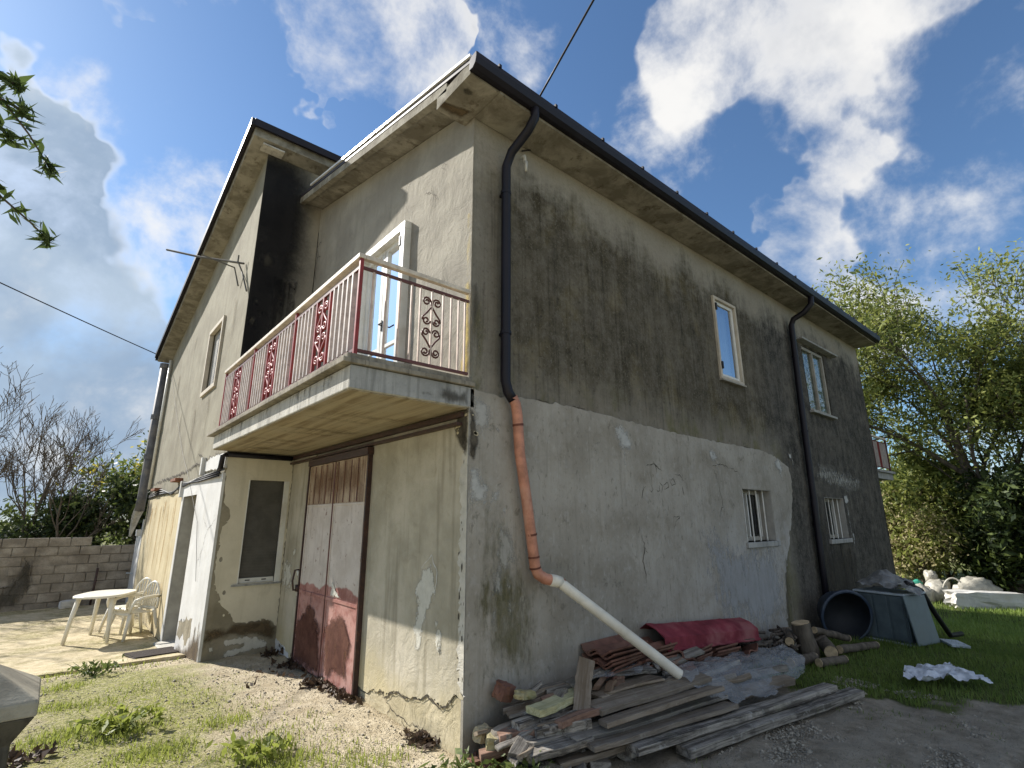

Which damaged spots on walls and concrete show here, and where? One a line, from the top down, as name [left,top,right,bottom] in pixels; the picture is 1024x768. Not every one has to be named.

leakage [240,155,310,365]
peeling [176,616,192,648]
flaking render [200,468,289,662]
flaking render [359,391,478,758]